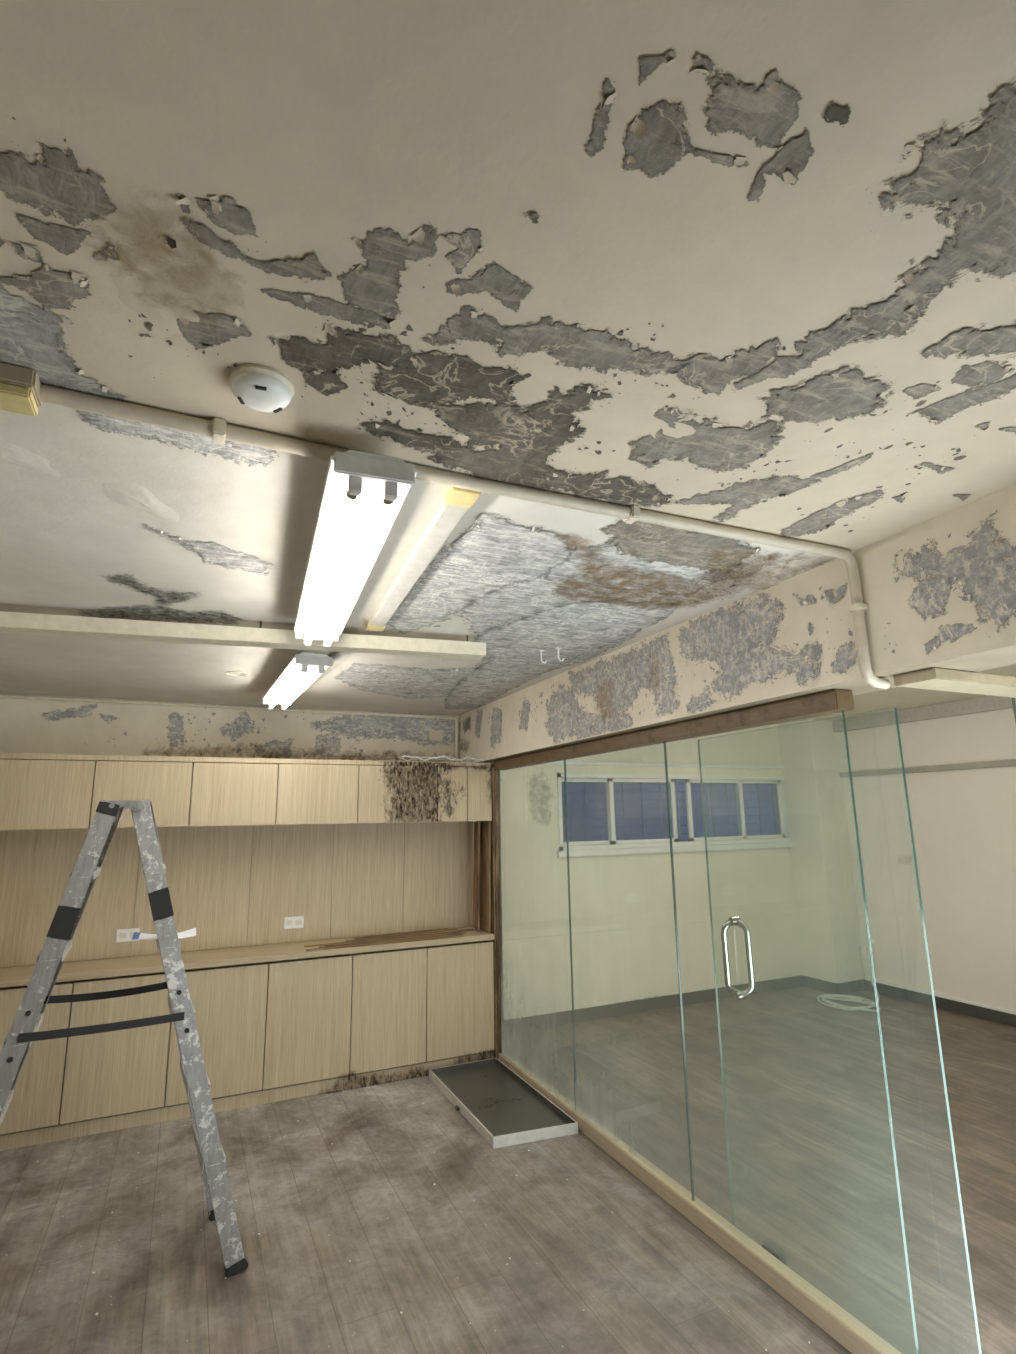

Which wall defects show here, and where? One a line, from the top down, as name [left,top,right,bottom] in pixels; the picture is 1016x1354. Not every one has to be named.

peeling [623,51,815,203]
peeling [0,138,129,401]
peeling [129,310,252,368]
peeling [75,410,279,467]
peeling [145,79,1016,759]
peeling [38,704,126,746]
damp [163,718,494,822]